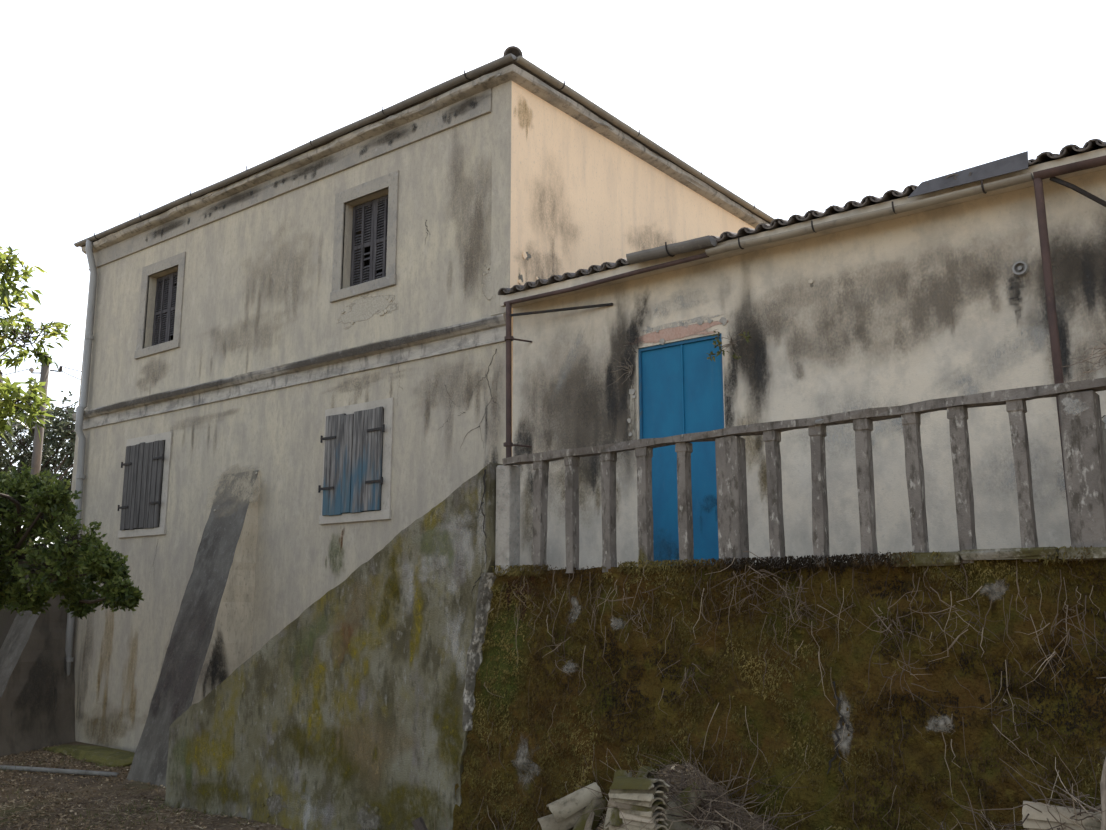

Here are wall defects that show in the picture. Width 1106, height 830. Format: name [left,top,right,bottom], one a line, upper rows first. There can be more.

spalling [628,317,728,345]
damp [724,305,780,428]
damp [1008,237,1106,373]